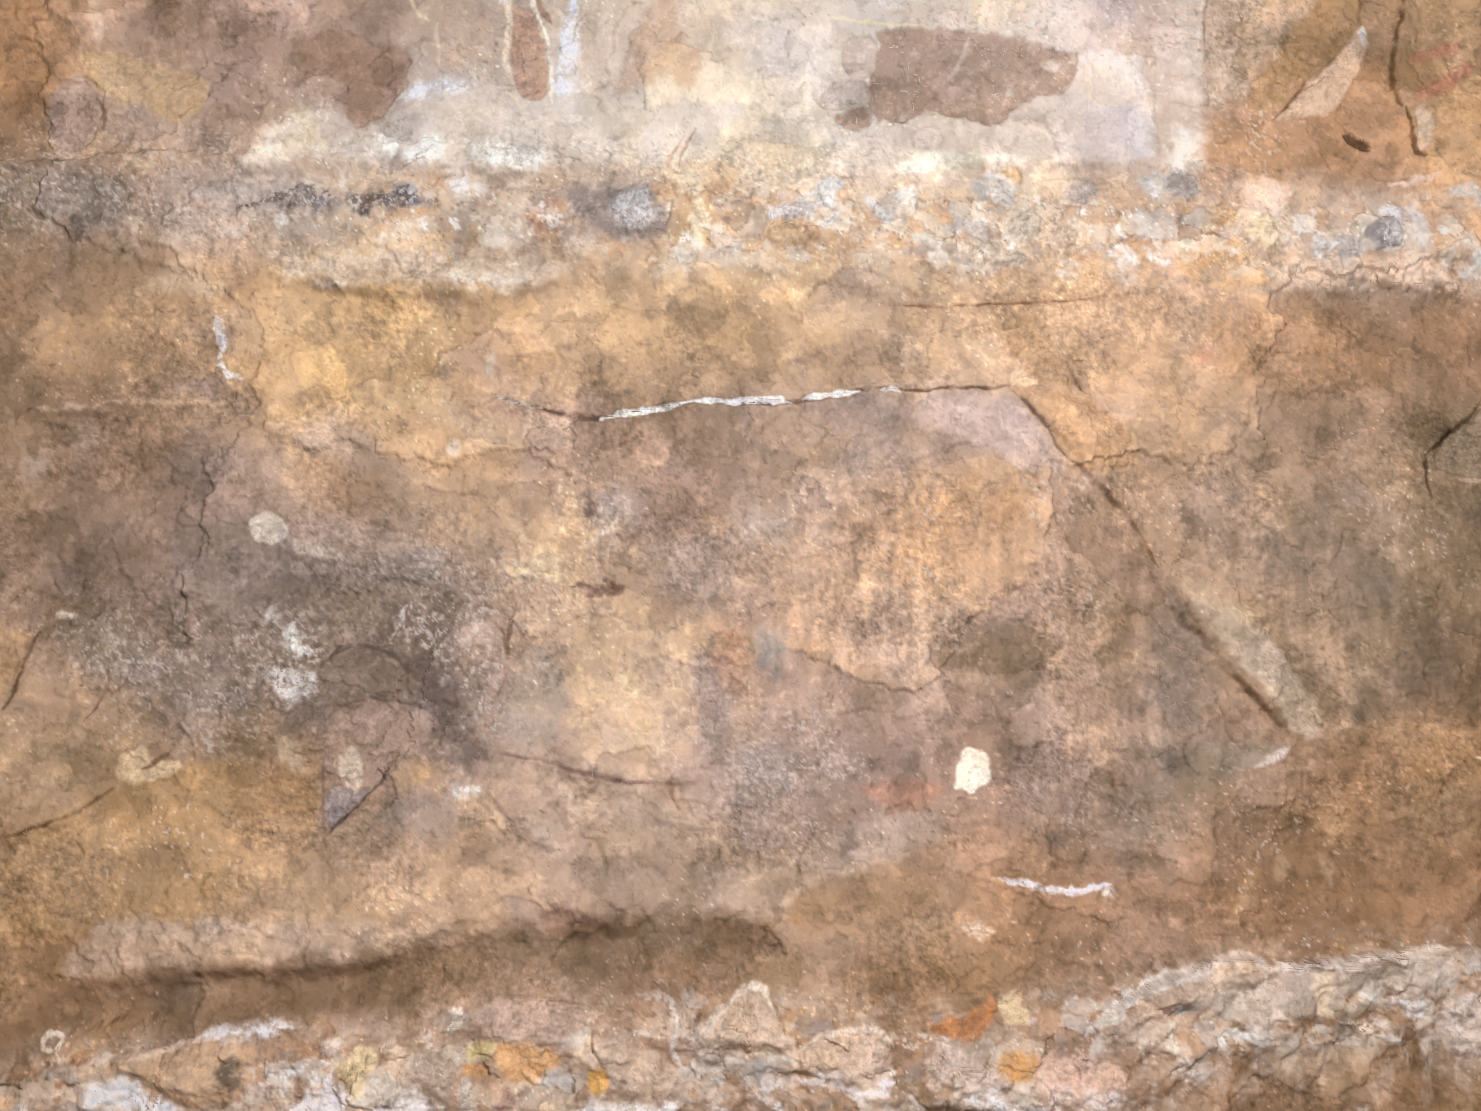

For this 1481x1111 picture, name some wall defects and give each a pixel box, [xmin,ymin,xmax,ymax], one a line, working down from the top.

flaking render [818,24,1081,132]
crack [1272,79,1308,121]
crack [1358,0,1431,157]
crack [1421,396,1481,498]
crack [488,384,1297,739]
crack [0,786,114,843]
damp [39,1027,67,1056]
damp [193,1015,308,1048]
damp [1341,983,1481,1069]
damp [73,1069,187,1111]
damp [255,1065,352,1111]
damp [959,1081,1139,1111]